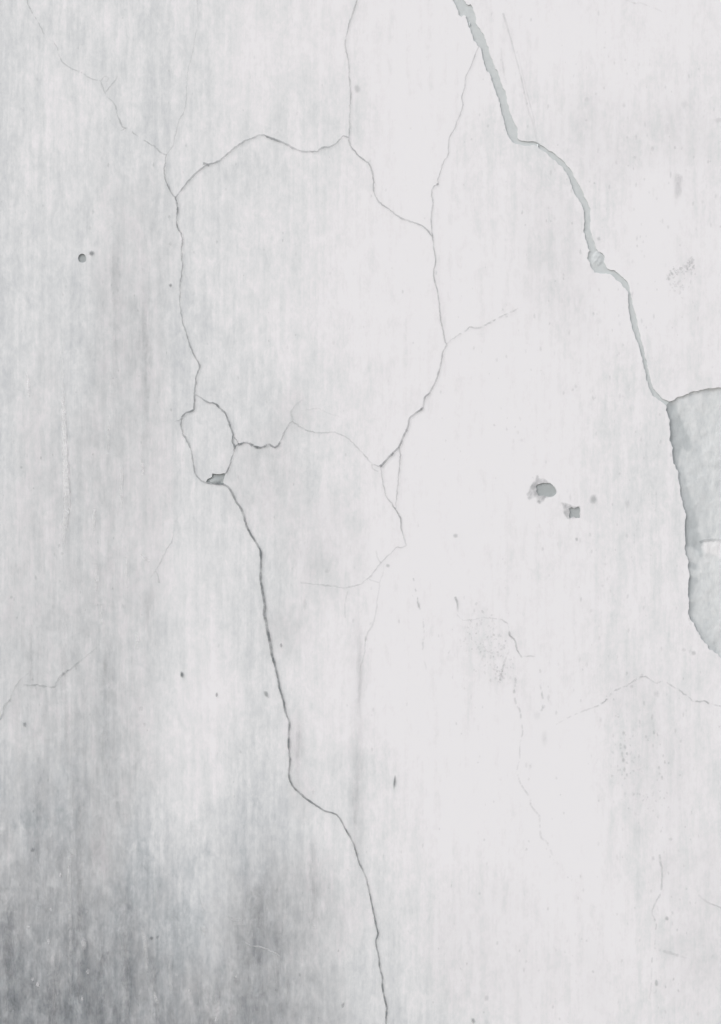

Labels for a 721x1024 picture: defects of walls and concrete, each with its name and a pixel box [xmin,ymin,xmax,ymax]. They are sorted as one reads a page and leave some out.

crack [453,0,669,405]
spalling [536,483,556,497]
spalling [569,507,580,518]
flaking render [666,387,721,658]
crack [182,350,387,1020]